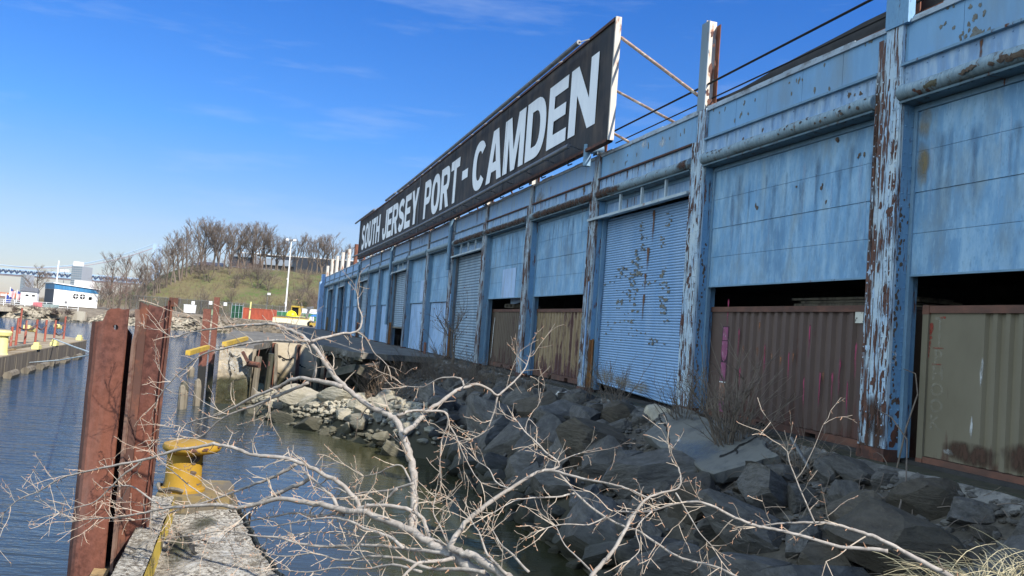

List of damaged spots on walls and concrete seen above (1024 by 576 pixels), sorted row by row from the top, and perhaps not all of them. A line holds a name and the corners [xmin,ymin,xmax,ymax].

peeling [581,177,598,323]
rust [642,197,655,316]
peeling [604,143,722,401]
peeling [777,79,910,428]
rust [949,443,990,466]
rust [1008,445,1024,472]